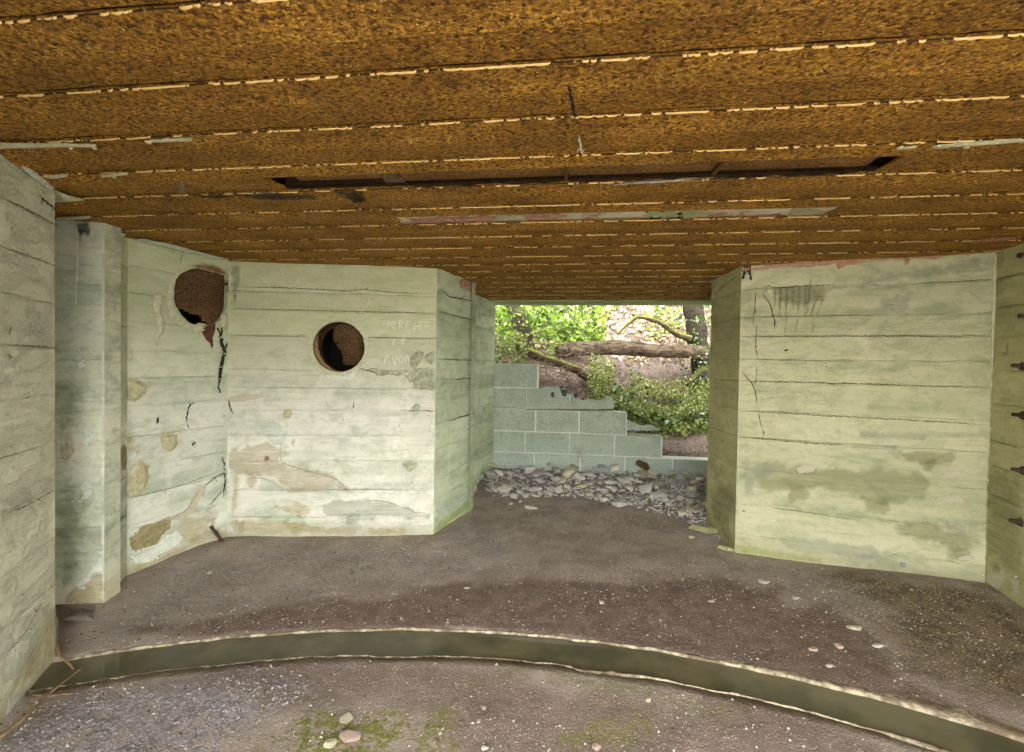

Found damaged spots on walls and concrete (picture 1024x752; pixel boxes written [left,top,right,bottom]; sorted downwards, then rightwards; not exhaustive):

crack [567,82,584,154]
corrosion [202,323,215,348]
crack [217,287,476,414]
crack [742,282,1019,449]
spalling [129,485,205,564]
crack [120,451,467,520]